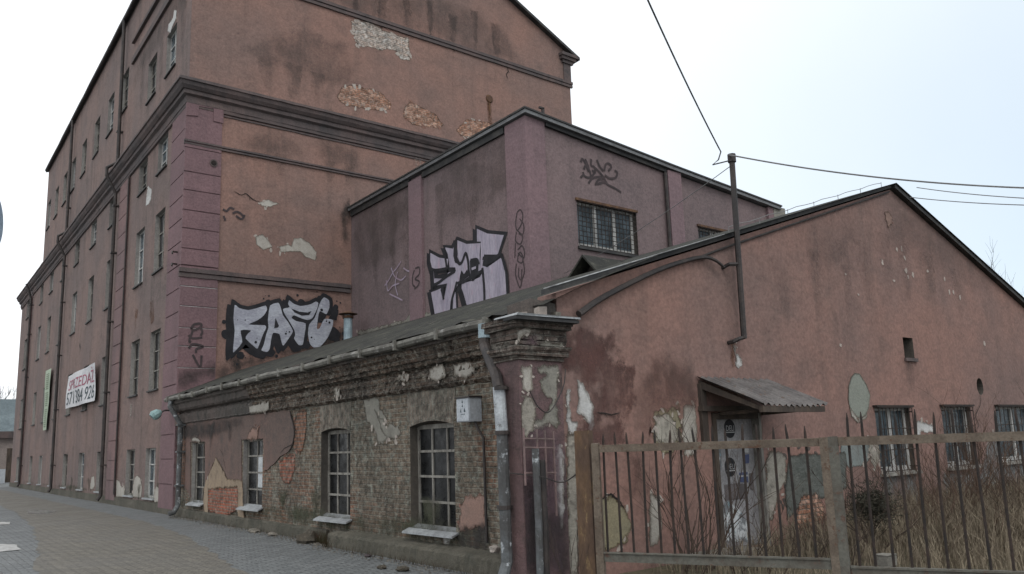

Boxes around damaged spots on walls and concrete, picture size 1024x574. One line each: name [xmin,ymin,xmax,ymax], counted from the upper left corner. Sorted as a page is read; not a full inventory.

flaking render [350,19,412,60]
flaking render [337,84,443,130]
peeling [254,234,317,260]
crack [281,409,297,452]
peeling [363,397,401,446]
water stain [564,328,636,445]
peeling [651,400,698,459]
peeling [848,373,871,423]
peeling [203,458,244,518]
spalling [519,364,594,574]
spalling [765,447,825,531]
peeling [602,495,632,552]